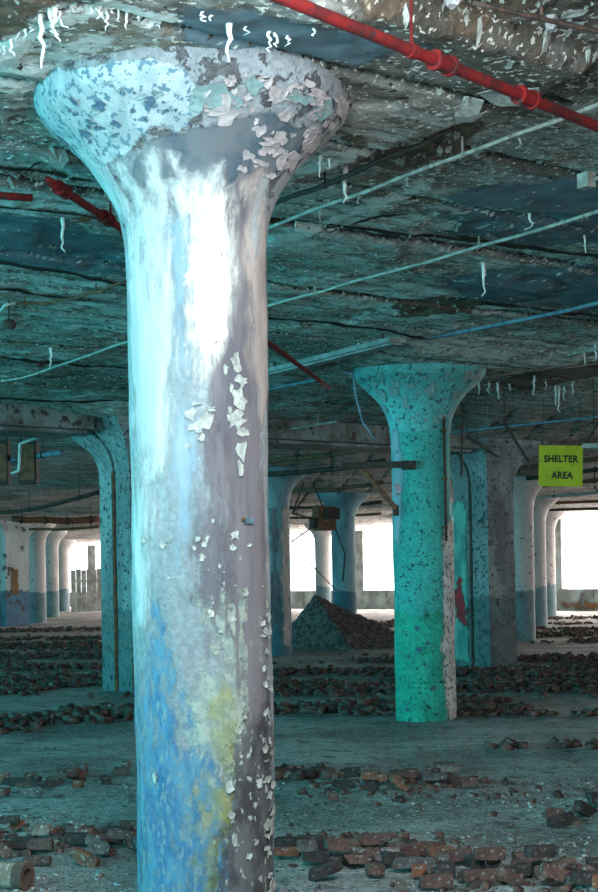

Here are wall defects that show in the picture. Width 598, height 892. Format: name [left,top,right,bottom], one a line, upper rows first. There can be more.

damp [0,0,395,65]
peeling [0,57,527,203]
crack [270,214,598,259]
peeling [184,402,216,449]
peeling [223,351,250,476]
peeling [192,531,272,654]